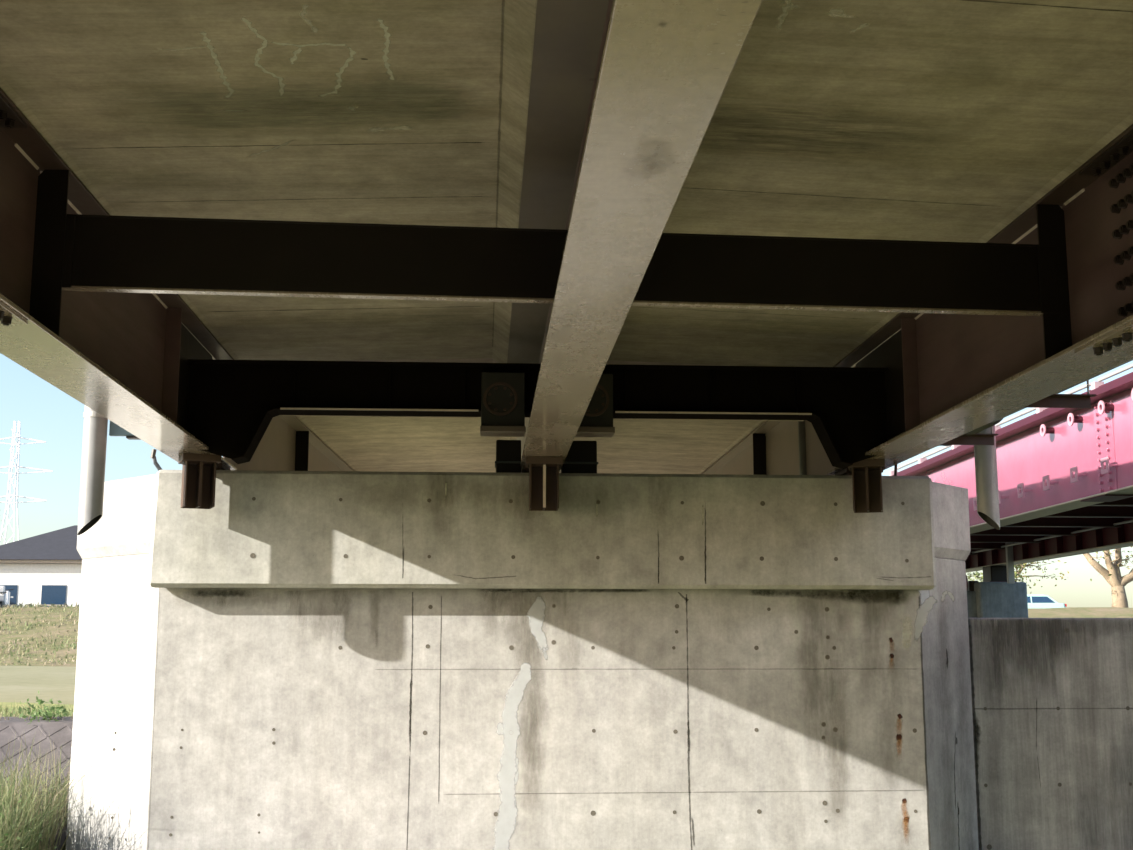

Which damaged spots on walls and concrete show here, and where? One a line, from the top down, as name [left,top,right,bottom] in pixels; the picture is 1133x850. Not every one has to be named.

crack [200,32,235,98]
crack [242,18,395,97]